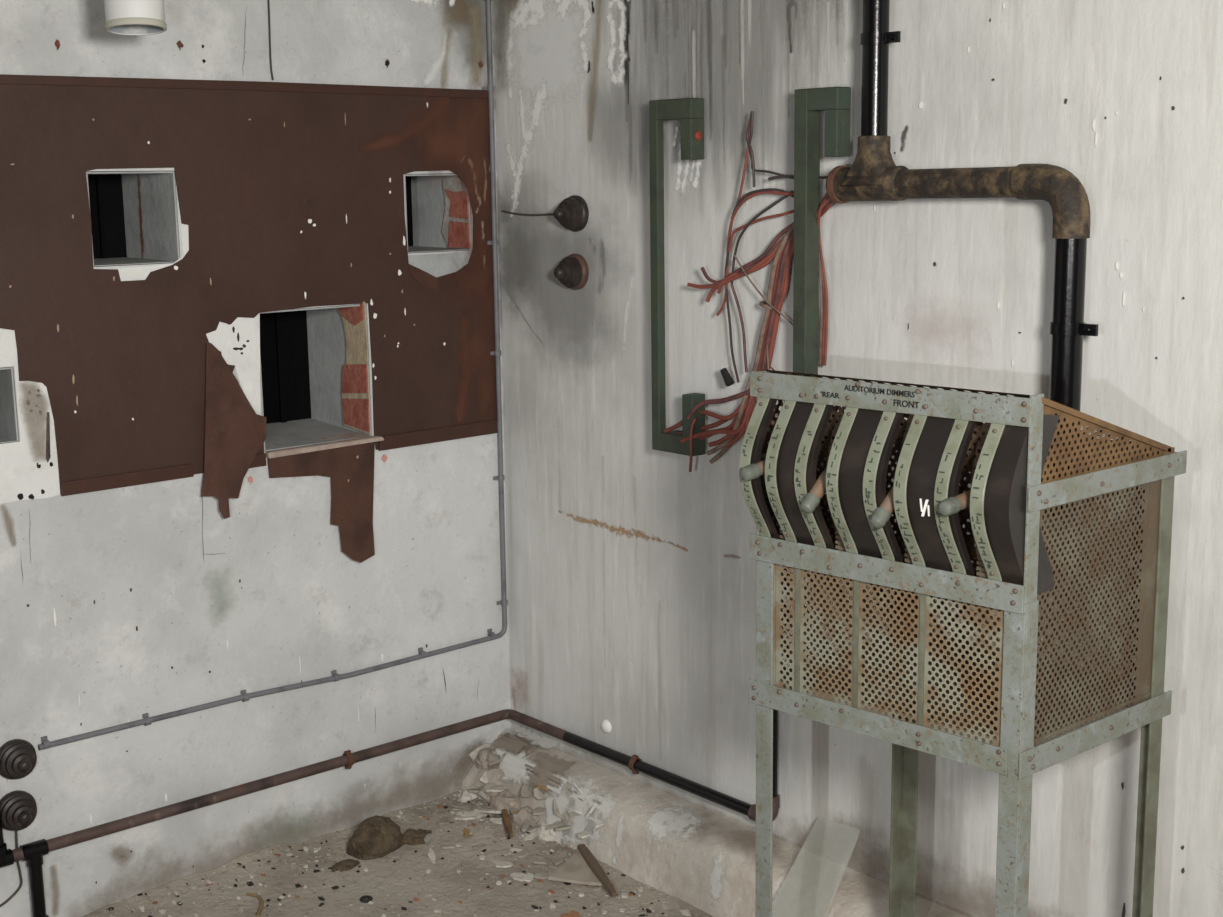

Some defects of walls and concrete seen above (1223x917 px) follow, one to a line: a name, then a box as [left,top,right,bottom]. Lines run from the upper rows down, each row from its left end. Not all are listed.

leakage [410,0,846,217]
peeling [113,224,189,281]
flaking render [398,158,490,293]
peeling [0,328,60,504]
peeling [206,313,261,415]
flaking render [338,299,377,434]
rust [559,511,688,551]
flaking render [424,727,604,882]